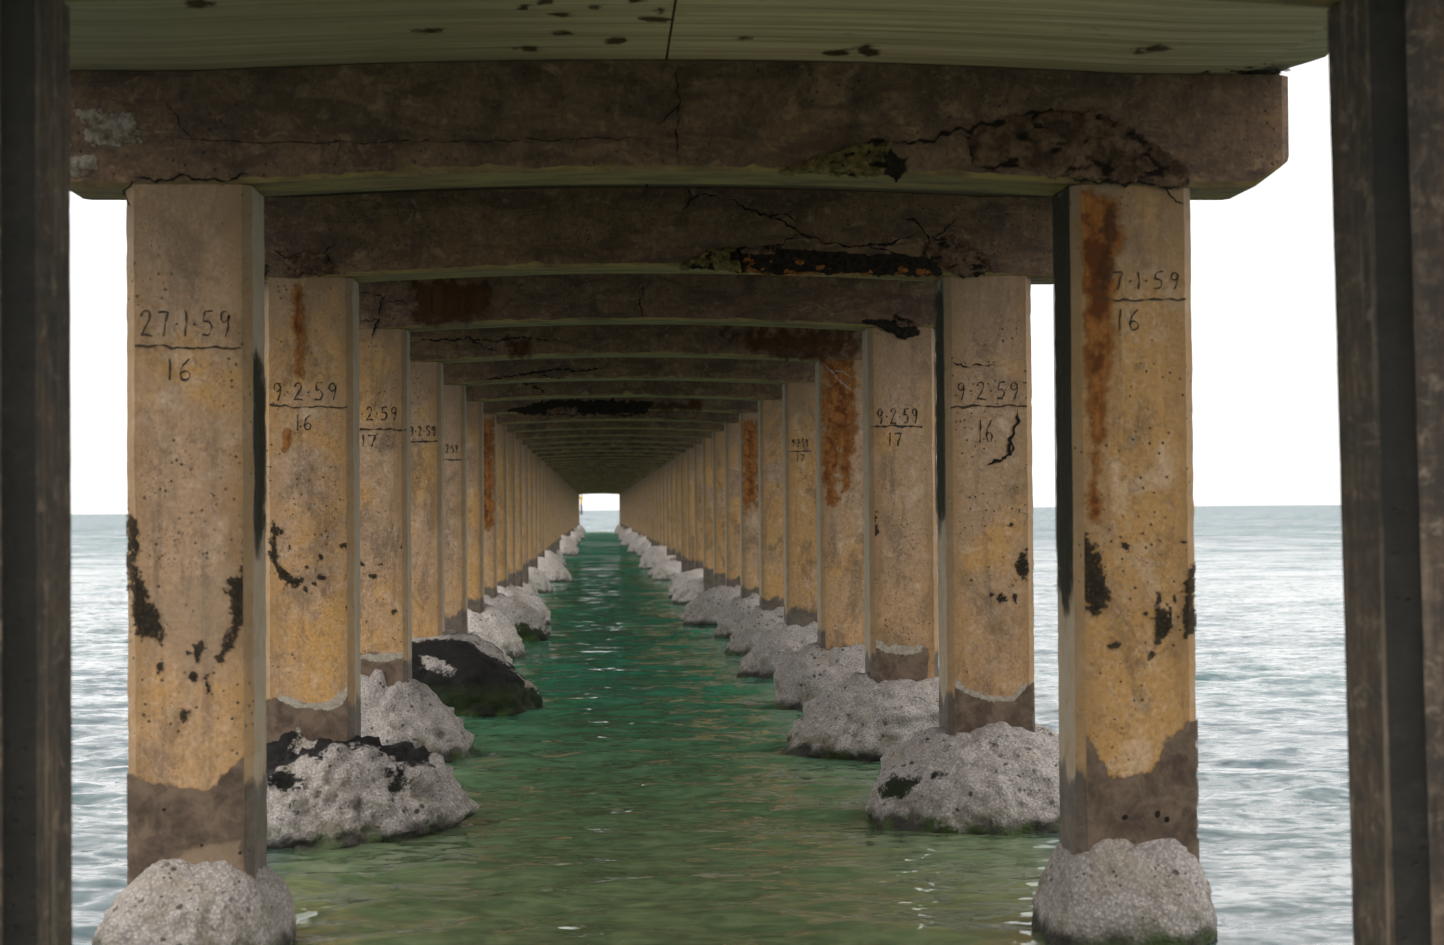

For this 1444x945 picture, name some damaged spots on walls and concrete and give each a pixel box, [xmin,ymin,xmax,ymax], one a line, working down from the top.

crack [123,62,957,264]
spalling [967,109,1189,189]
spalling [736,235,996,279]
corrosion [483,418,495,531]
corrosion [720,325,859,509]
crack [987,411,1021,465]
corrosion [1081,190,1125,522]
water stain [126,507,167,674]
water stain [186,512,243,695]
water stain [1142,562,1197,660]
water stain [127,757,244,886]
water stain [1086,719,1199,863]